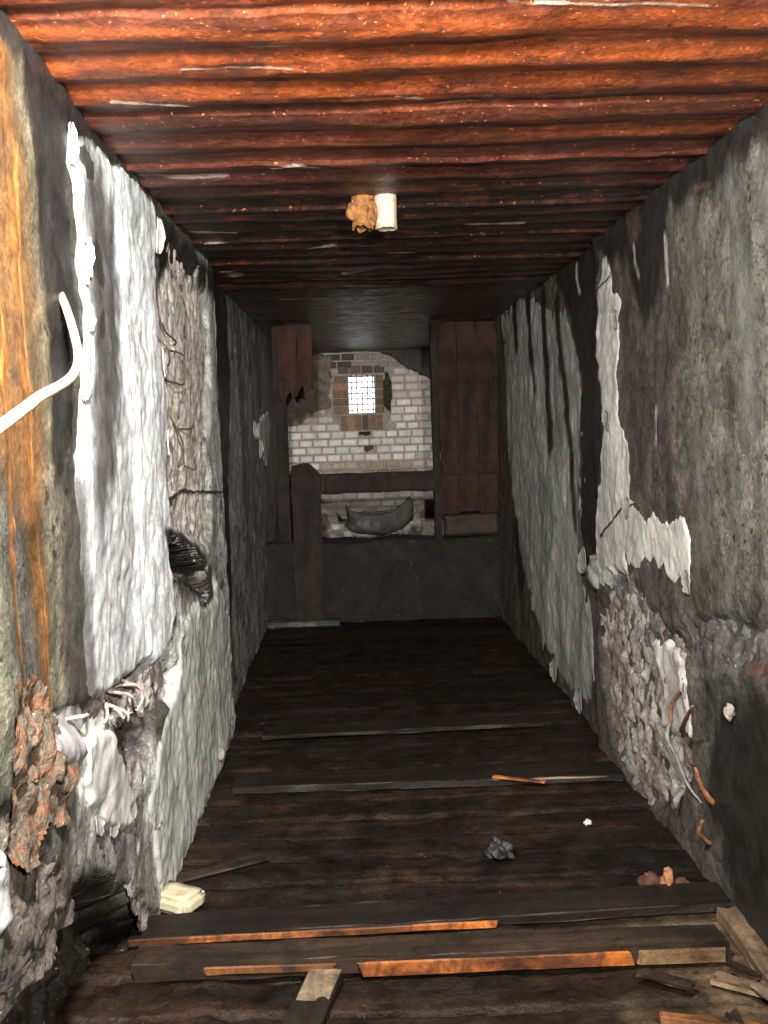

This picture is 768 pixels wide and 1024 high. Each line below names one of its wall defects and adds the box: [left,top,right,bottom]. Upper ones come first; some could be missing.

corrosion [0,40,80,877]
flaking render [0,122,213,933]
crack [169,488,224,515]
flaking render [501,255,768,809]
spalling [0,813,75,1022]
leakage [709,696,768,948]